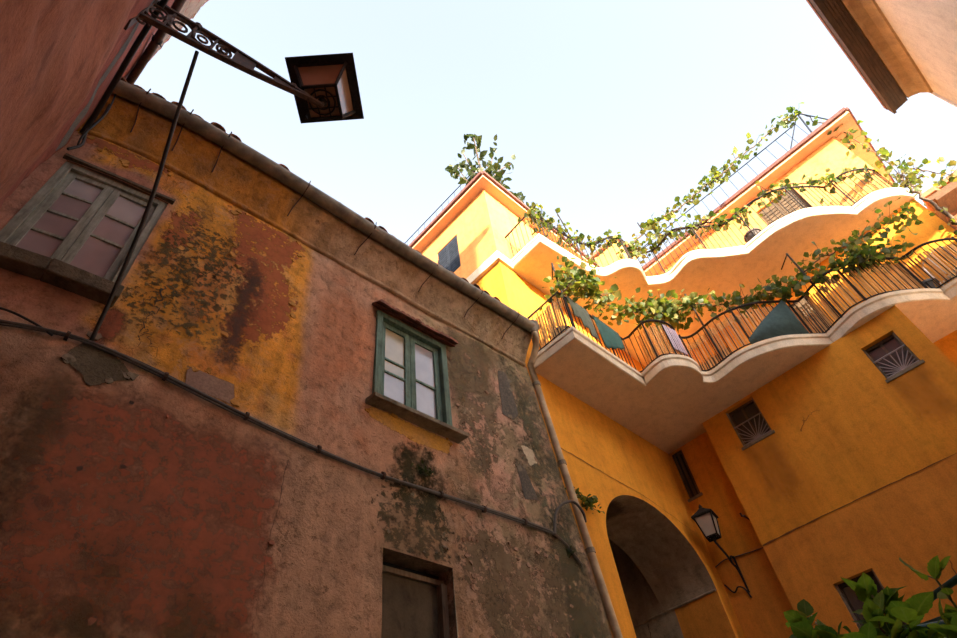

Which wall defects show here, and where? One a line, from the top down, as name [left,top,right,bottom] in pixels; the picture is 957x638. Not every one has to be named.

peeling [160,210,203,250]
peeling [218,205,305,350]
spalling [446,348,518,475]
damp [399,448,437,520]
spalling [515,445,540,467]